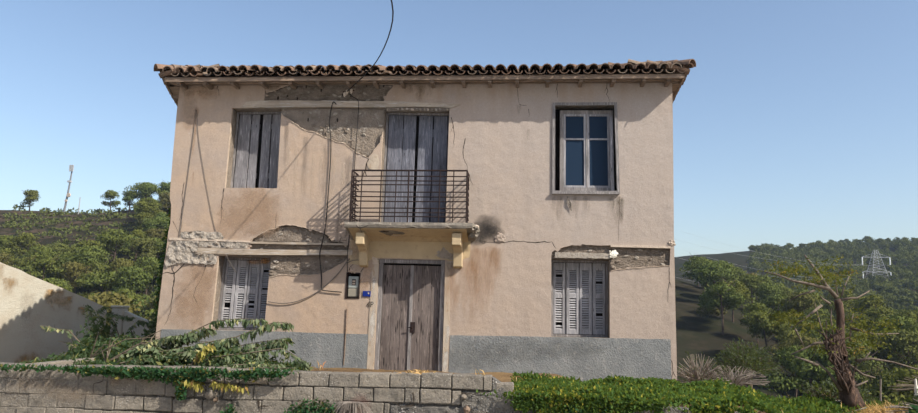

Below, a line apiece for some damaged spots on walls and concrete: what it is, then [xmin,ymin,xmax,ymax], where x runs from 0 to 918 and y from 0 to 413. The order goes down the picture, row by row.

flaking render [265,85,450,170]
flaking render [165,224,348,278]
crack [480,239,555,247]
flaking render [551,244,670,272]
crack [163,263,206,324]